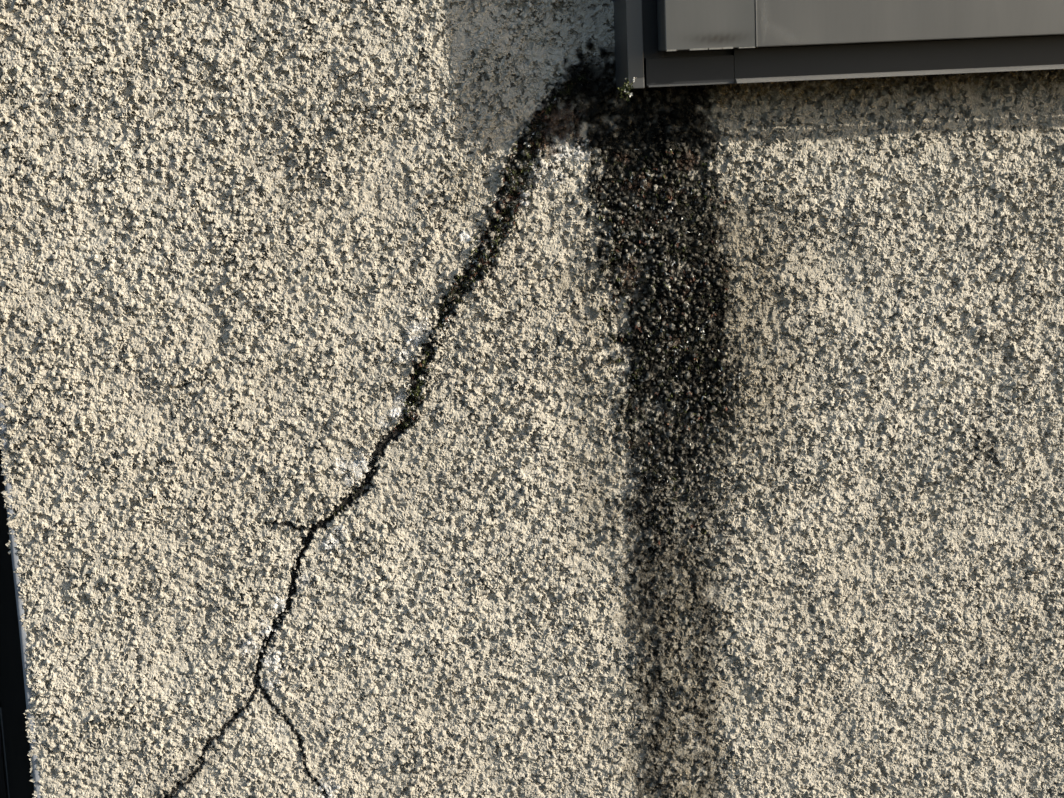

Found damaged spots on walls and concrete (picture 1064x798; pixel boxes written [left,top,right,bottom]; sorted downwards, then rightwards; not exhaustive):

crack [164,72,593,798]
leakage [552,42,1064,798]